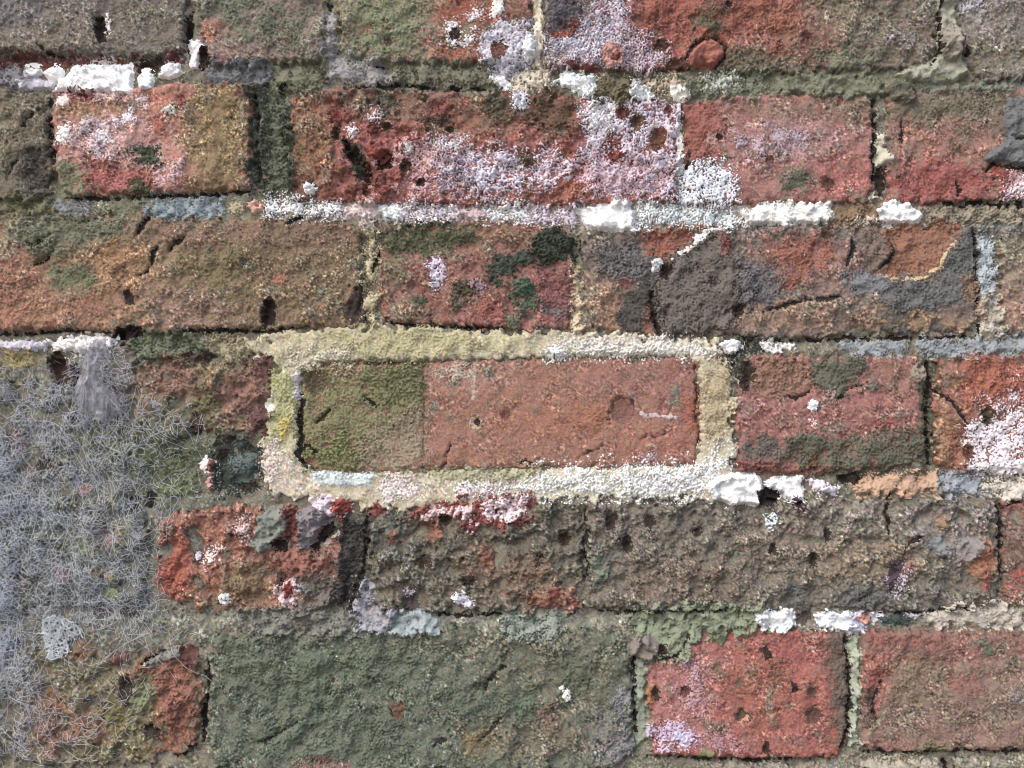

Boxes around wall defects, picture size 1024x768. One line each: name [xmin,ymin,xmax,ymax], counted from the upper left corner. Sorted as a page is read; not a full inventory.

damp [242,0,835,336]
efflorescence [957,366,1024,479]